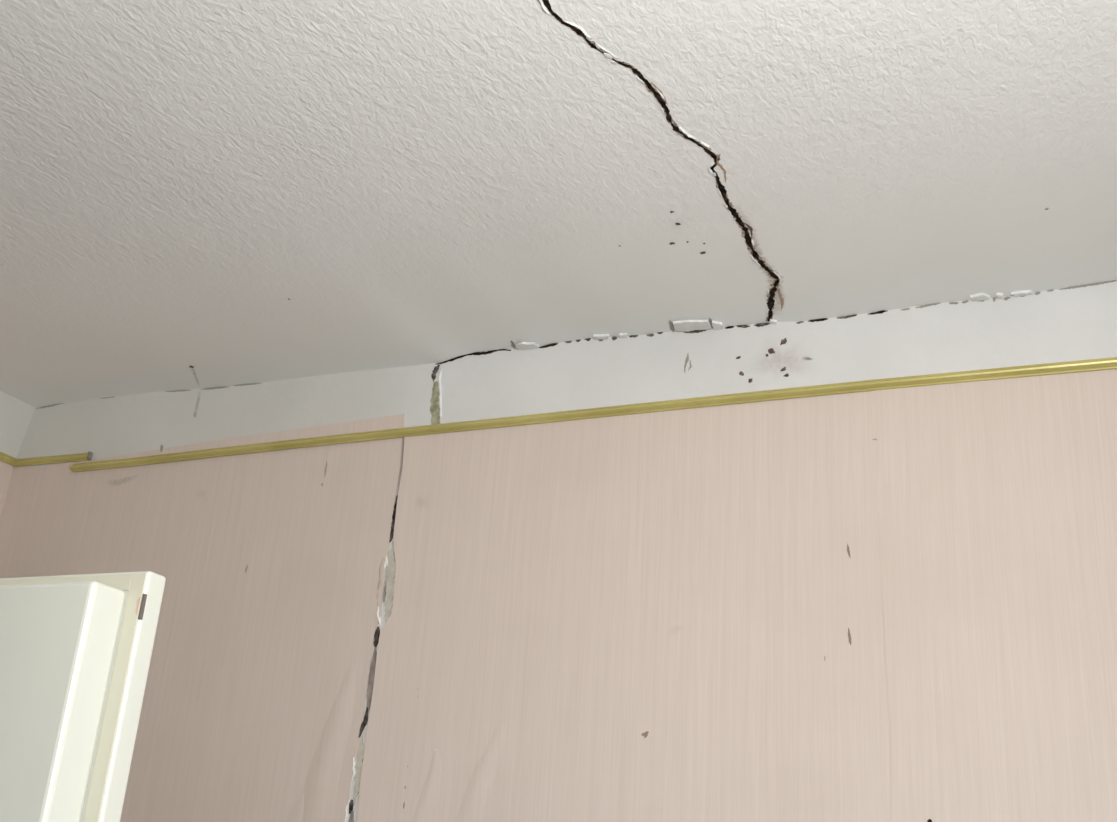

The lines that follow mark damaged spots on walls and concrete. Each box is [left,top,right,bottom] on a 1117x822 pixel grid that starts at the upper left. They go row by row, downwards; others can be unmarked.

crack [430,0,1117,425]
crack [345,437,404,822]